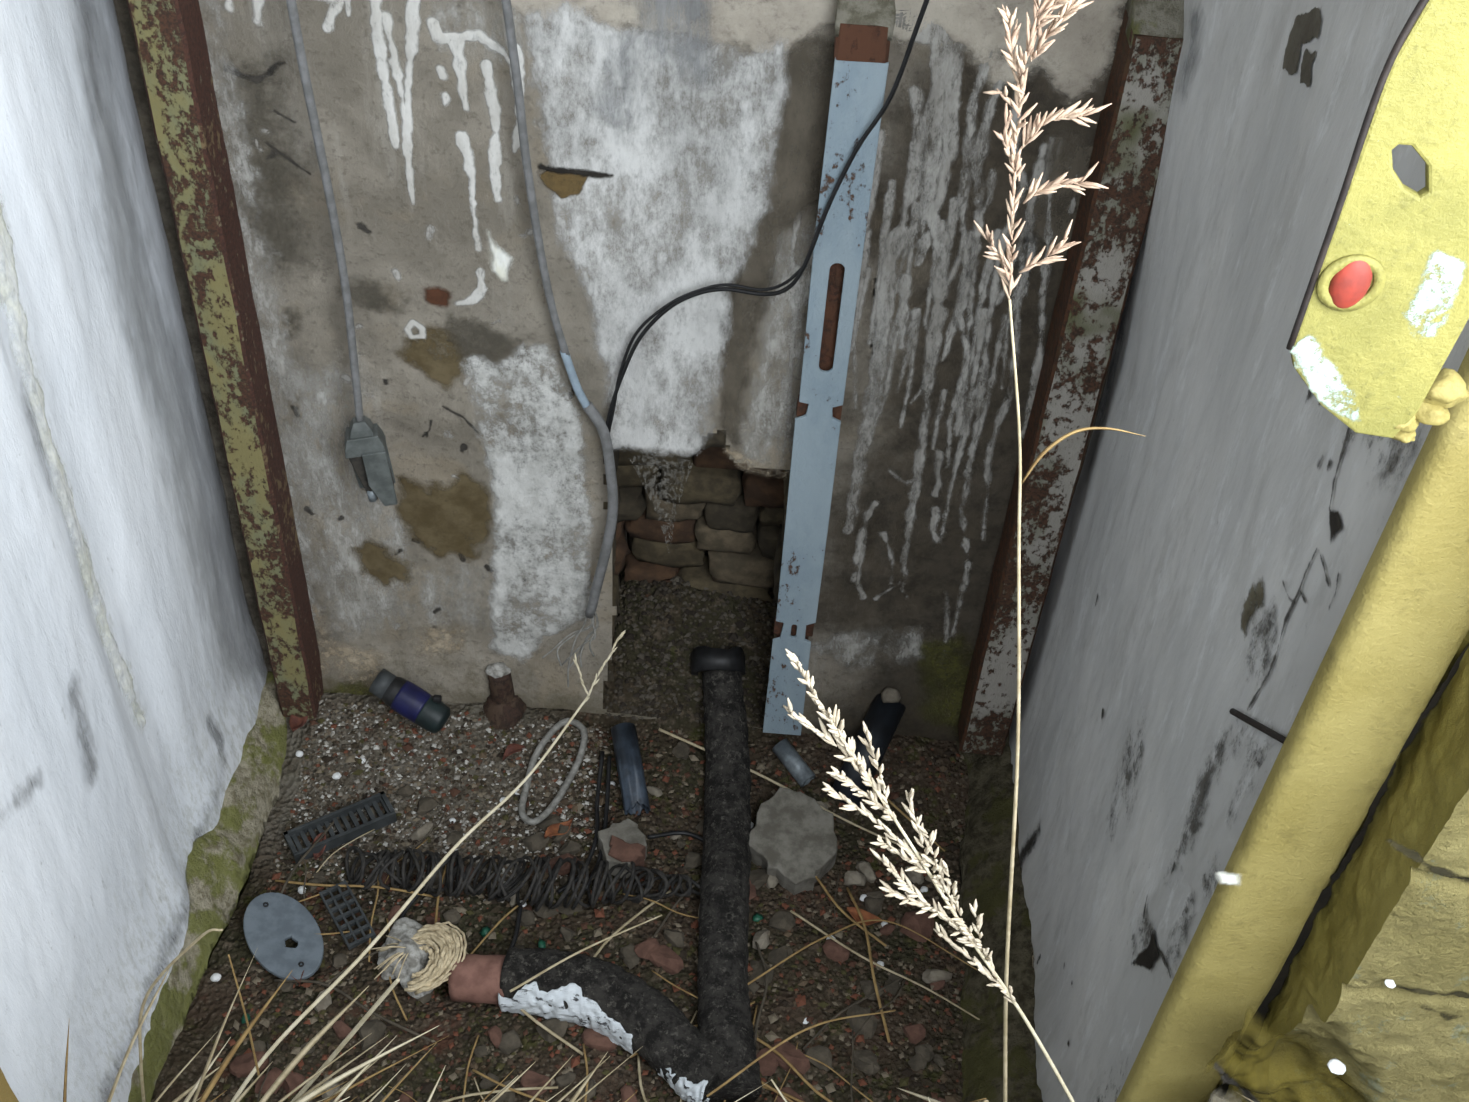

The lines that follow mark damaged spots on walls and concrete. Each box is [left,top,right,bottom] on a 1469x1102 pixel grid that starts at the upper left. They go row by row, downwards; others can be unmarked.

flaking render [893,0,1128,103]
peeling [1283,7,1321,87]
water stain [229,68,307,268]
water stain [399,328,469,388]
water stain [370,0,525,306]
peeling [511,0,837,477]
water stain [719,37,835,444]
water stain [843,10,1093,644]
water stain [397,473,493,559]